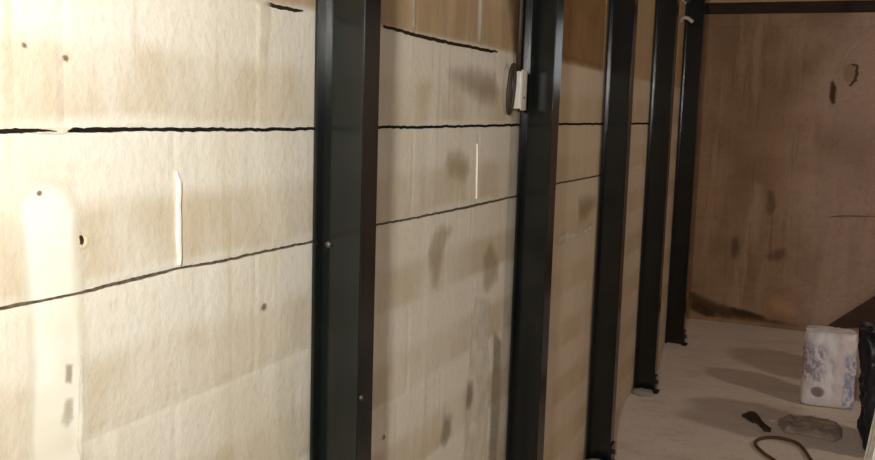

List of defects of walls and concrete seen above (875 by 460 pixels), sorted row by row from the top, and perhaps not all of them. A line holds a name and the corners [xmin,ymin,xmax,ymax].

crack [383,25,498,53]
crack [0,126,314,134]
crack [378,122,519,130]
crack [559,120,603,128]
crack [556,174,600,185]
crack [376,195,517,226]
crack [0,240,312,310]
water stain [690,294,762,320]